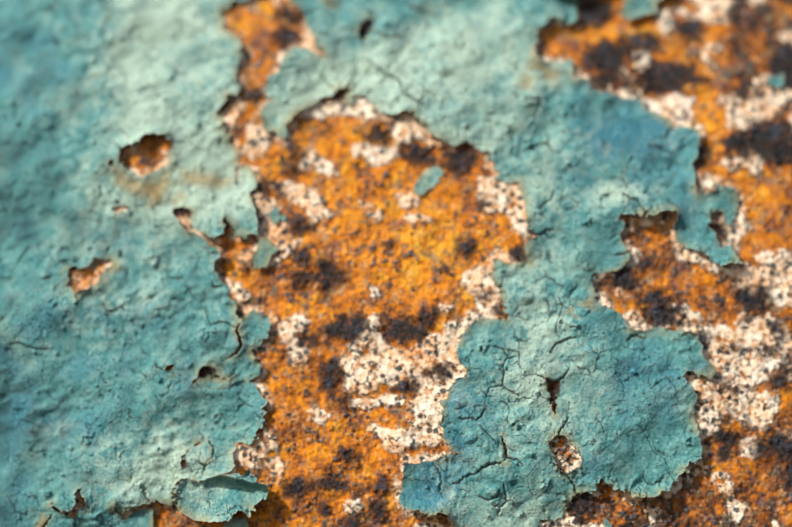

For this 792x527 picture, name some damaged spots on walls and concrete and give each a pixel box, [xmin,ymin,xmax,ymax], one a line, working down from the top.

rust [581,18,711,96]
rust [718,110,792,168]
peeling [67,258,111,295]
crack [161,261,243,378]
peeling [108,0,535,527]
rust [289,308,435,348]
crack [533,191,577,353]
rust [602,255,688,330]
peeling [535,0,792,527]
crack [435,346,523,498]
peeling [52,488,86,519]
crack [480,484,508,517]